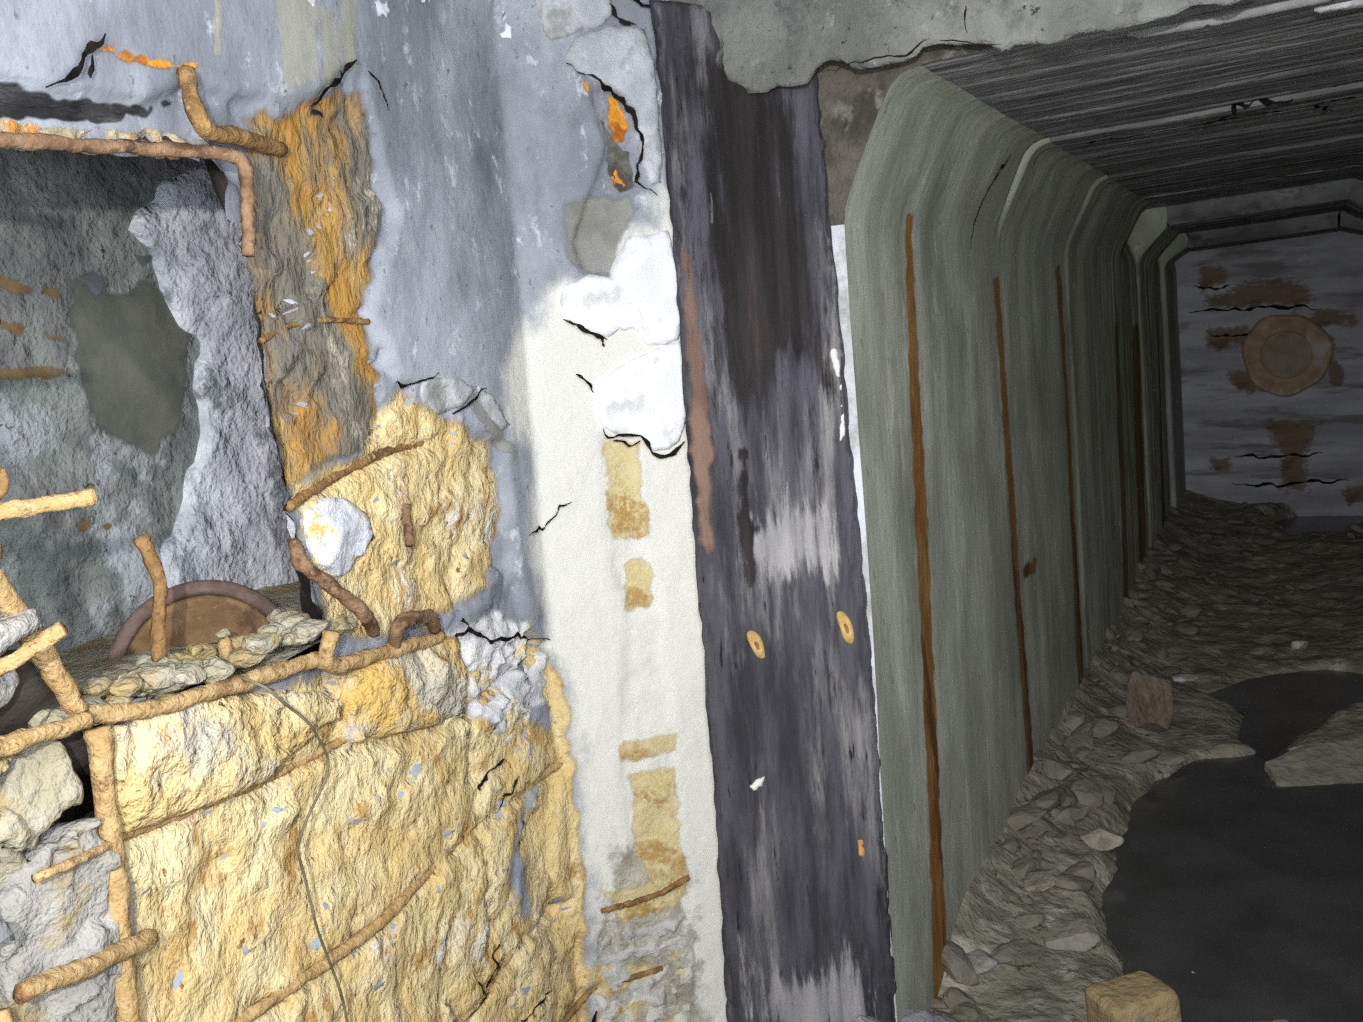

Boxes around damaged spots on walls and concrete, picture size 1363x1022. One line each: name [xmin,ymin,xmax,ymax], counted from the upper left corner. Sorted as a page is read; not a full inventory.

flaking render [533,0,662,192]
flaking render [1126,0,1363,39]
flaking render [0,65,564,1022]
corrosion [245,87,500,637]
crack [563,319,607,347]
crack [576,374,594,393]
flaking render [559,231,686,451]
crack [603,429,685,459]
damp [737,447,758,588]
damp [685,49,834,422]
corrosion [906,214,946,997]
corrosion [124,639,653,1022]